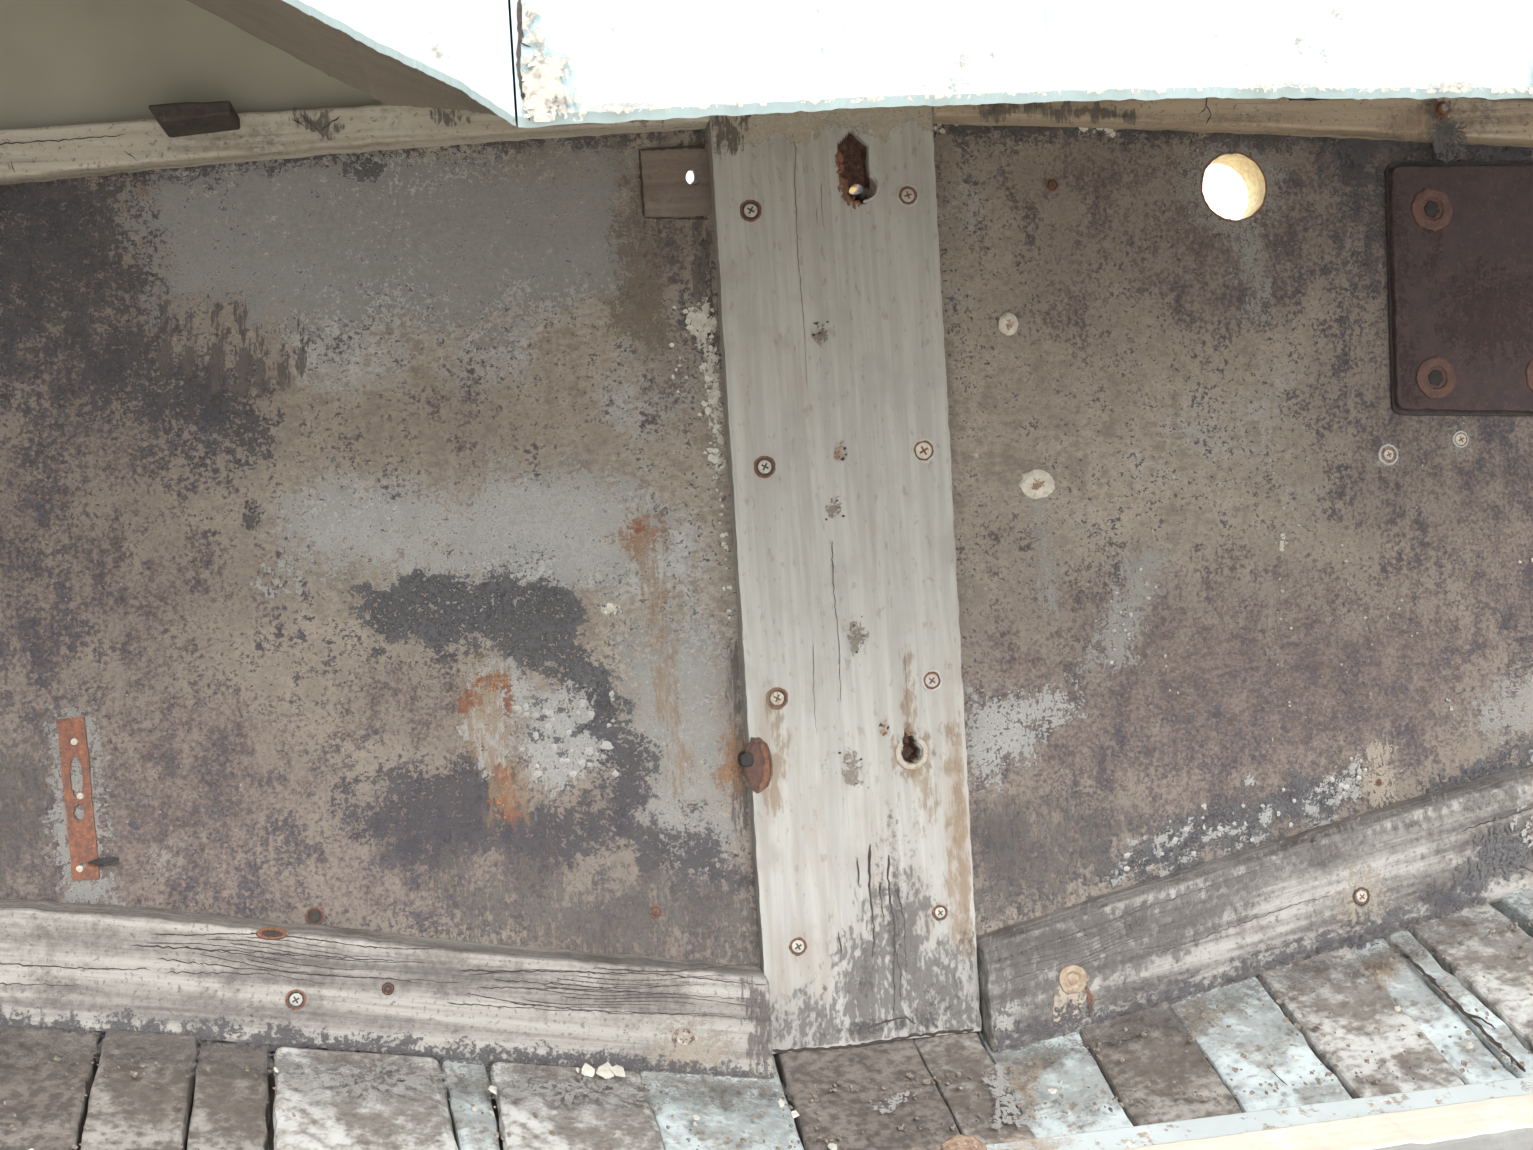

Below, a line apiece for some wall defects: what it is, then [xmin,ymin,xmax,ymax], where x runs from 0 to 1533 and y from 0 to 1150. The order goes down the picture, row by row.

rust [835,150,862,209]
damp [0,78,1533,477]
damp [241,500,265,531]
damp [1496,609,1533,684]
rust [56,717,119,881]
rust [451,656,544,826]
rust [712,719,746,803]
damp [0,641,1533,1111]